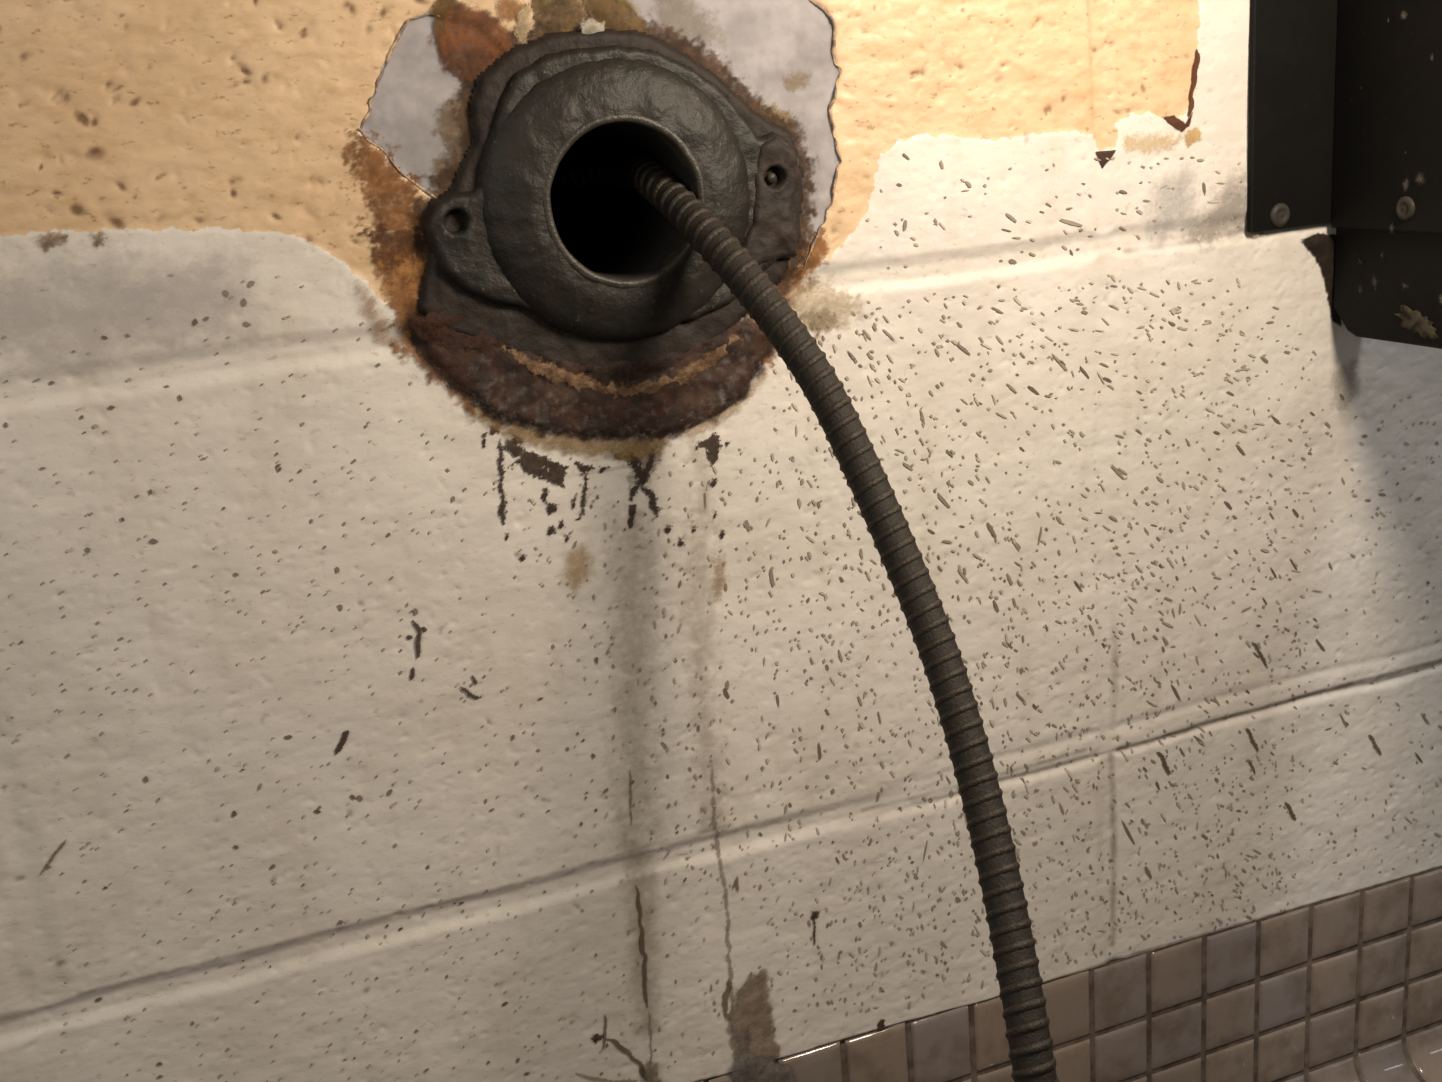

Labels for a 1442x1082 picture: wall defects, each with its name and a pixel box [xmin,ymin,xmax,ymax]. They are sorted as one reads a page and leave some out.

peeling [358,13,465,198]
rust [342,0,777,461]
peeling [618,0,842,267]
rust [643,4,860,331]
peeling [1096,150,1116,168]
peeling [1164,49,1200,132]
crack [627,773,635,822]
crack [731,876,739,891]
crack [576,886,653,1082]
crack [722,981,732,1021]